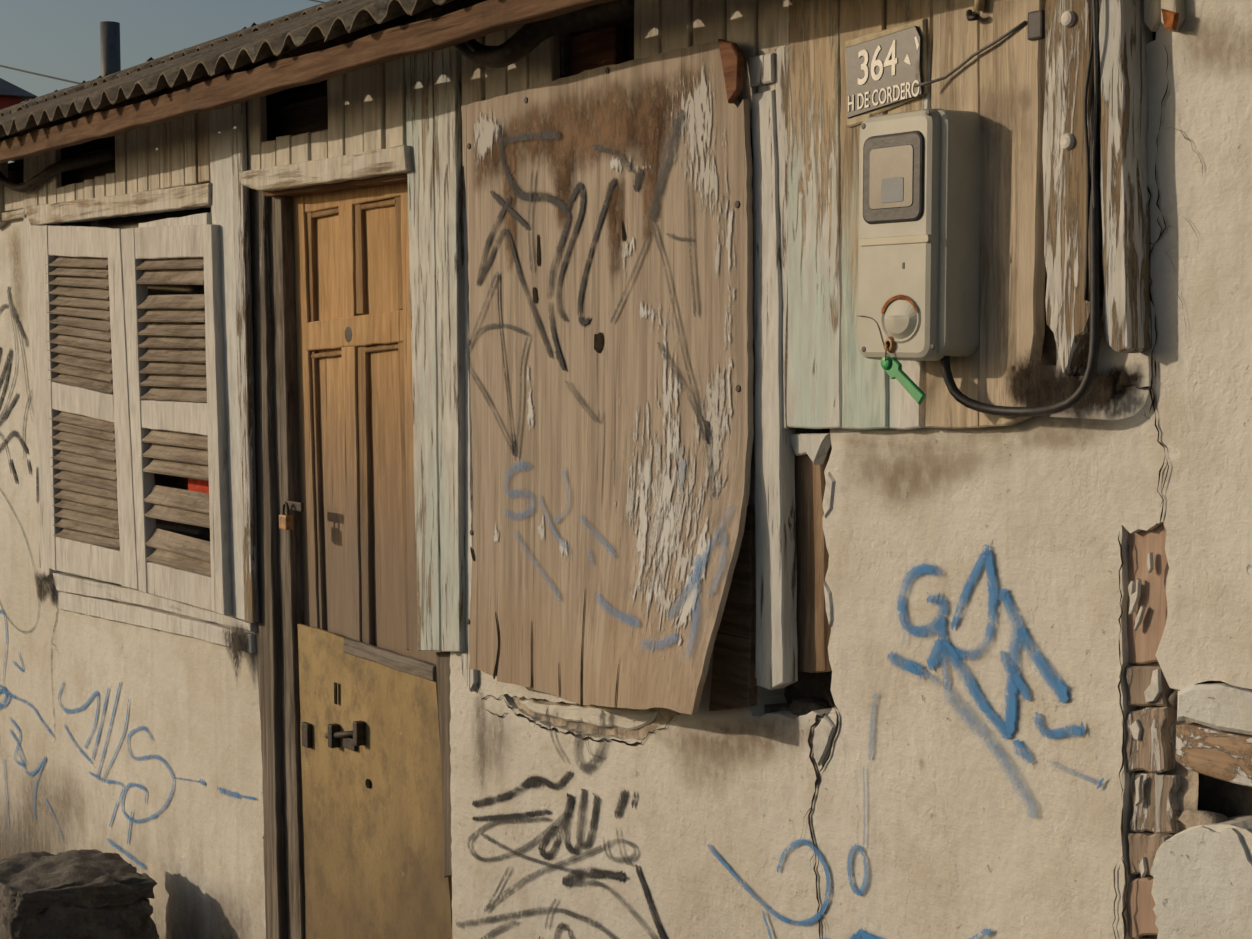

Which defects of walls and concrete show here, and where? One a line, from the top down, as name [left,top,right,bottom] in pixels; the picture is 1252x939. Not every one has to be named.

peeling [474,61,735,657]
water stain [1010,351,1141,411]
crack [1117,45,1203,522]
flaking render [511,696,681,739]
crack [800,698,848,939]
flaking render [1125,524,1252,939]